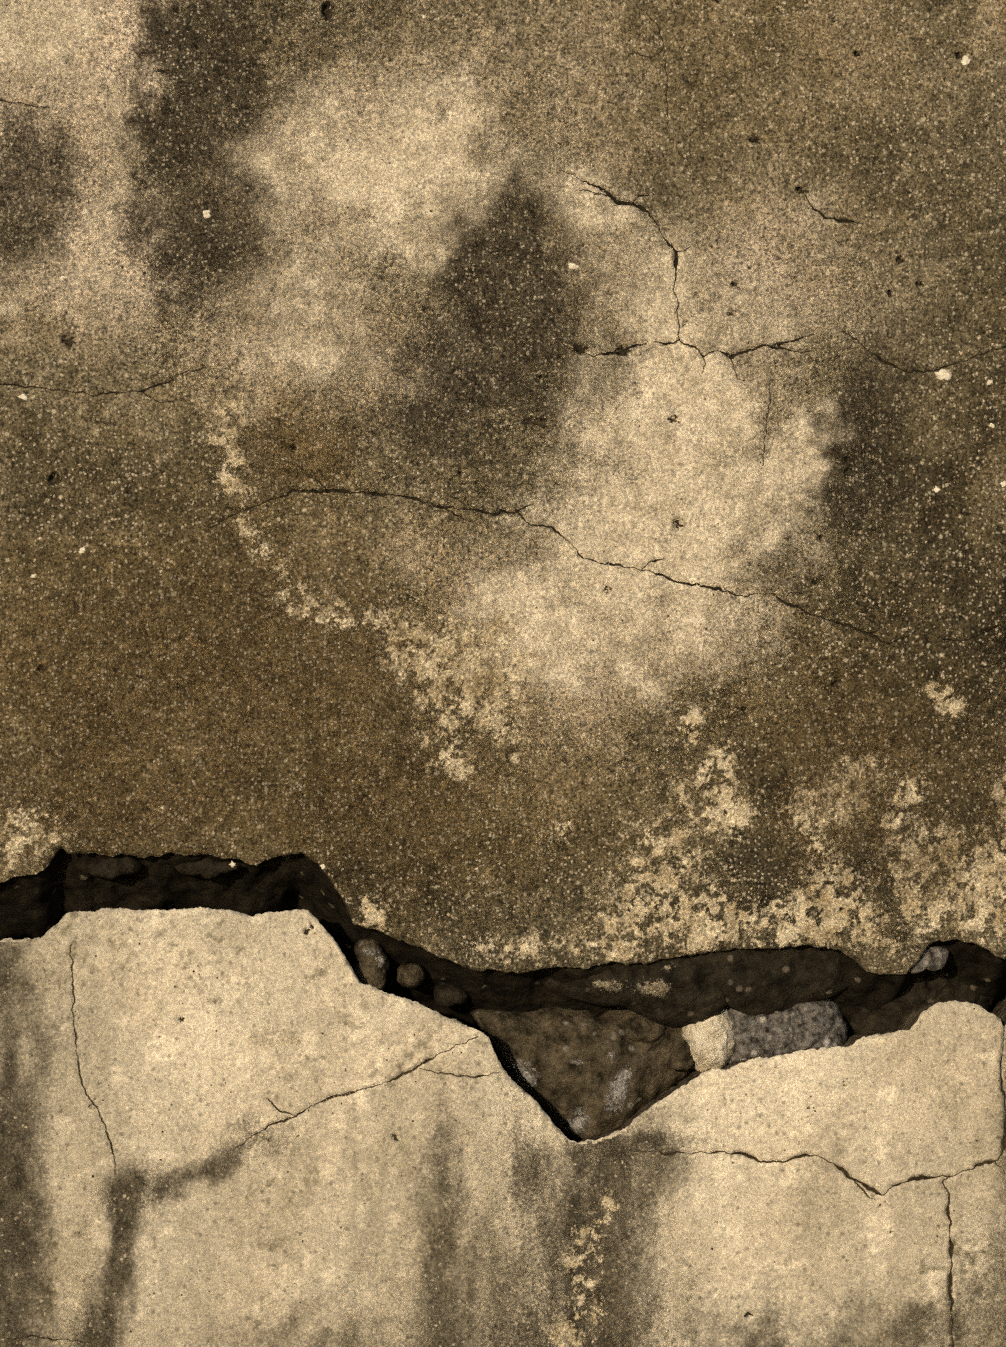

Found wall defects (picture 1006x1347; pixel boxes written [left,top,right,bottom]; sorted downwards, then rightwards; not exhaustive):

leakage [0,0,916,710]
crack [555,170,1006,466]
crack [209,476,1001,665]
crack [0,848,645,1172]
peeling [348,889,391,932]
spalling [568,1001,948,1143]
crack [627,939,1006,1347]
spalling [989,993,1006,1026]
leakage [76,1144,244,1347]